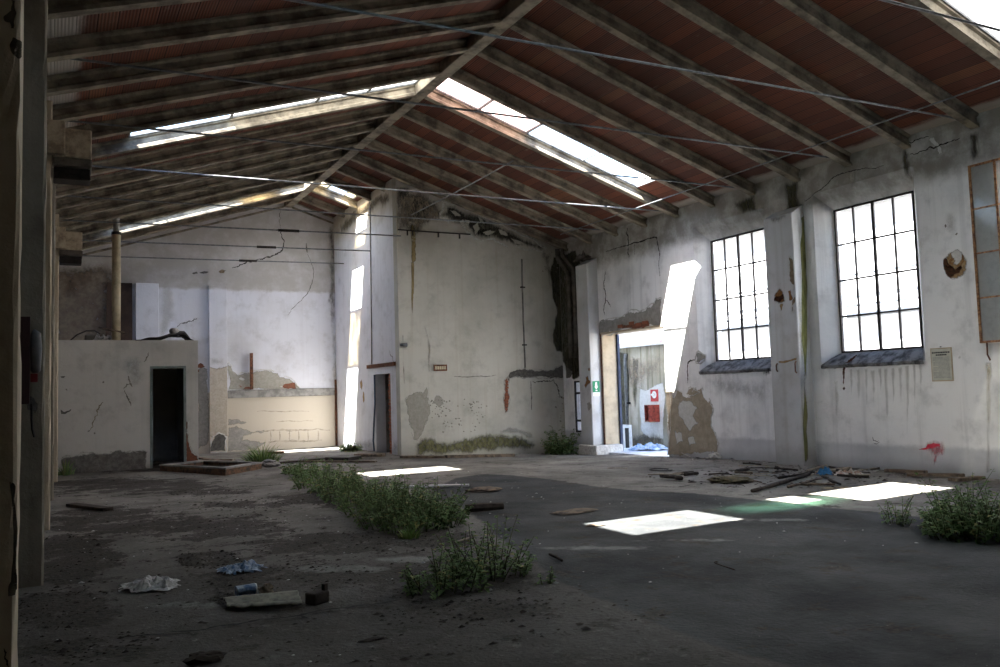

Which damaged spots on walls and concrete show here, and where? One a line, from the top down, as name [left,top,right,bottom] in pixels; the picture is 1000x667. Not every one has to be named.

crack [909,136,959,155]
crack [233,213,314,310]
crack [603,228,660,314]
peeling [185,362,300,461]
peeling [405,387,487,440]
spalling [503,354,572,413]
spalling [599,297,720,458]